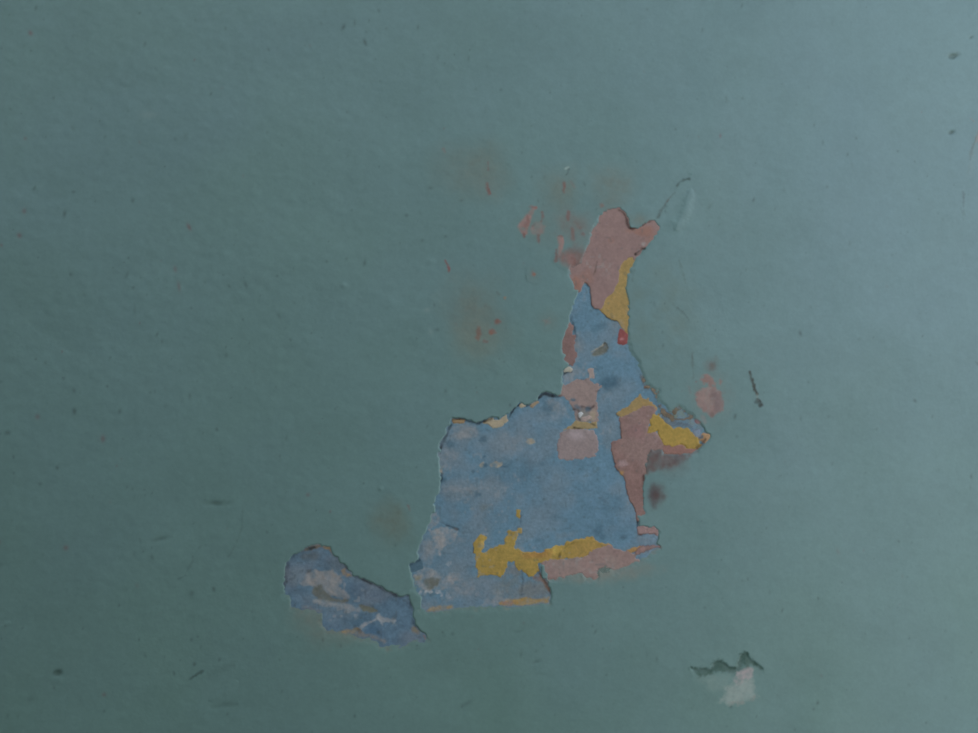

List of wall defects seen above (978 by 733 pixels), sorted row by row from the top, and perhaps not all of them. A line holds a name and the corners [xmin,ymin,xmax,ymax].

peeling [283,207,742,655]